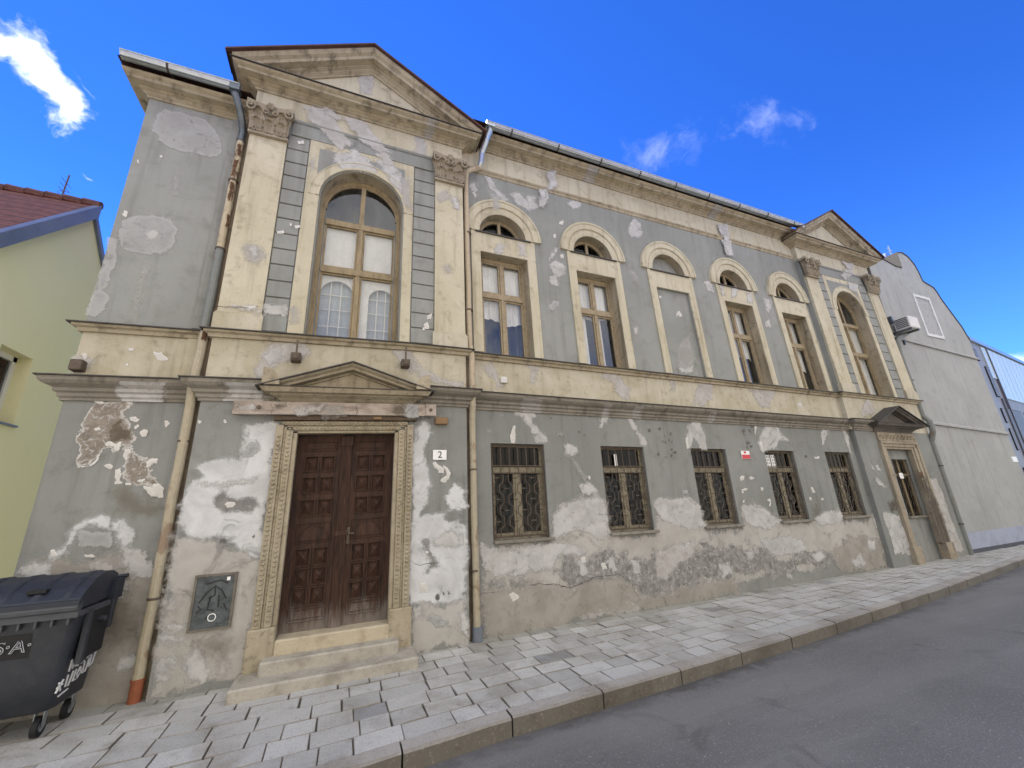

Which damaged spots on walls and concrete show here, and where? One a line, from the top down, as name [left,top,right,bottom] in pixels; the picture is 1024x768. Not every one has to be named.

rust [227,144,242,201]
peeling [376,160,403,193]
peeling [86,237,118,317]
peeling [75,401,164,498]
peeling [433,462,451,483]
peeling [510,412,561,443]
flaking render [411,476,887,654]